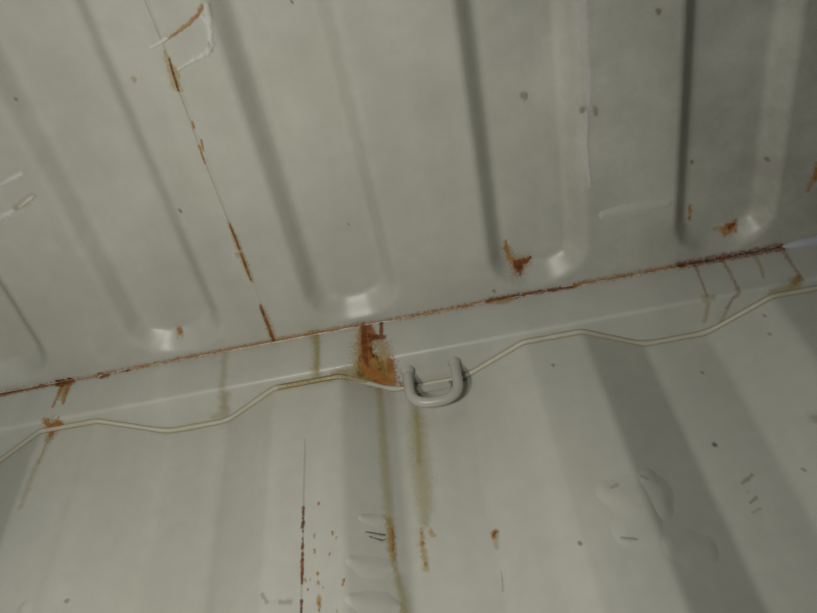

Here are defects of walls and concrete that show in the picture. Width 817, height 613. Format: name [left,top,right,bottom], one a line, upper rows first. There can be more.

corrosion [721,219,736,236]
corrosion [0,241,784,407]
corrosion [300,506,308,591]